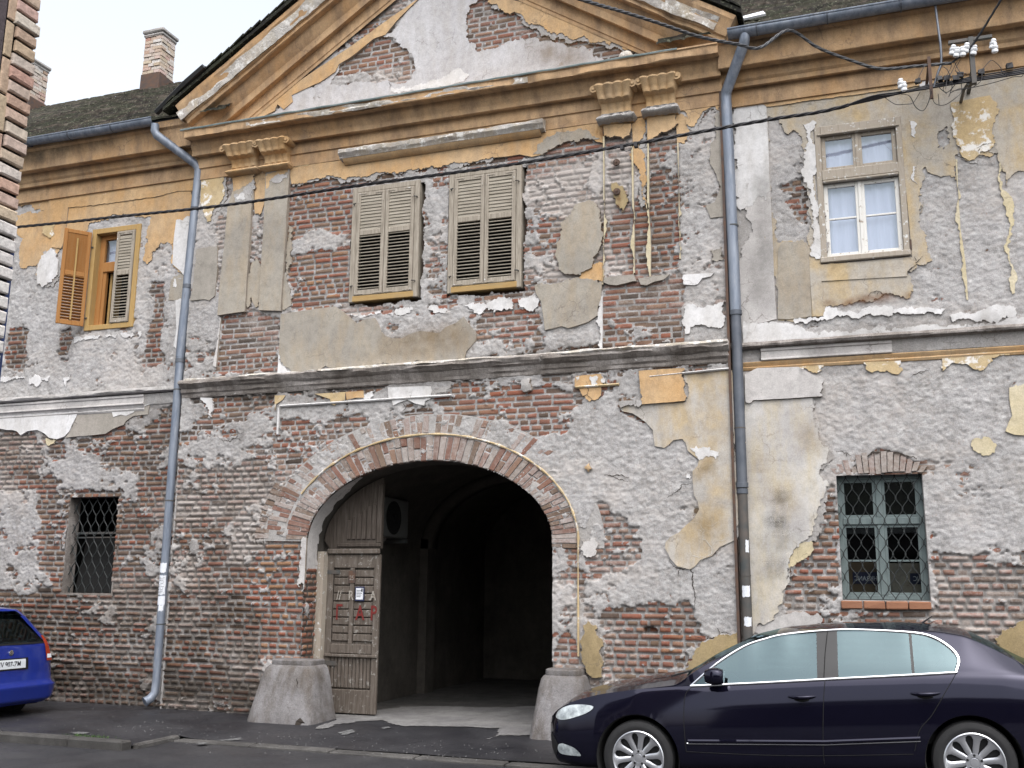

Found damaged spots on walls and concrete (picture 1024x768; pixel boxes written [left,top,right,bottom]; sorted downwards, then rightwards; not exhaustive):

flaking render [256,0,636,117]
flaking render [16,74,1024,387]
spalling [0,325,50,387]
flaking render [0,404,150,446]
peeling [200,397,215,417]
spalling [231,477,363,662]
spalling [580,512,644,580]
spalling [928,543,1024,637]
spalling [581,600,705,683]